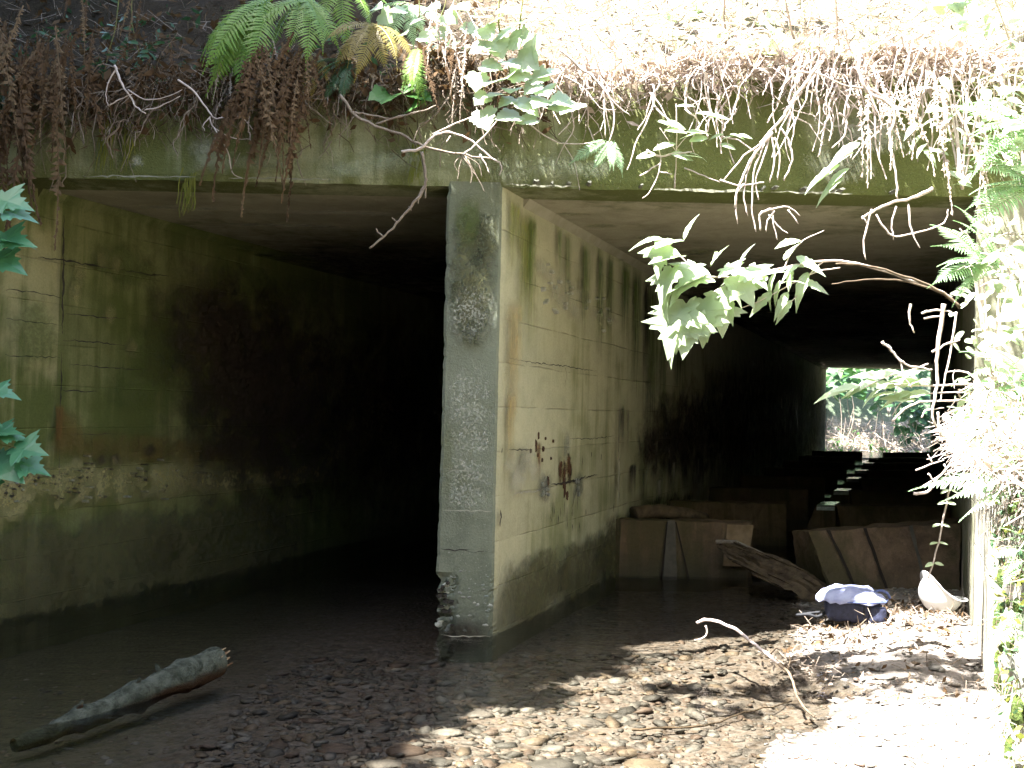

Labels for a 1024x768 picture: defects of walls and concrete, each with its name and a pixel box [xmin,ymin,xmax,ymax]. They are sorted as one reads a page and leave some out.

leakage [260,206,498,345]
leakage [511,205,536,289]
crack [6,220,169,509]
corrosion [530,432,572,500]
spalling [435,570,492,632]
leakage [503,516,631,619]